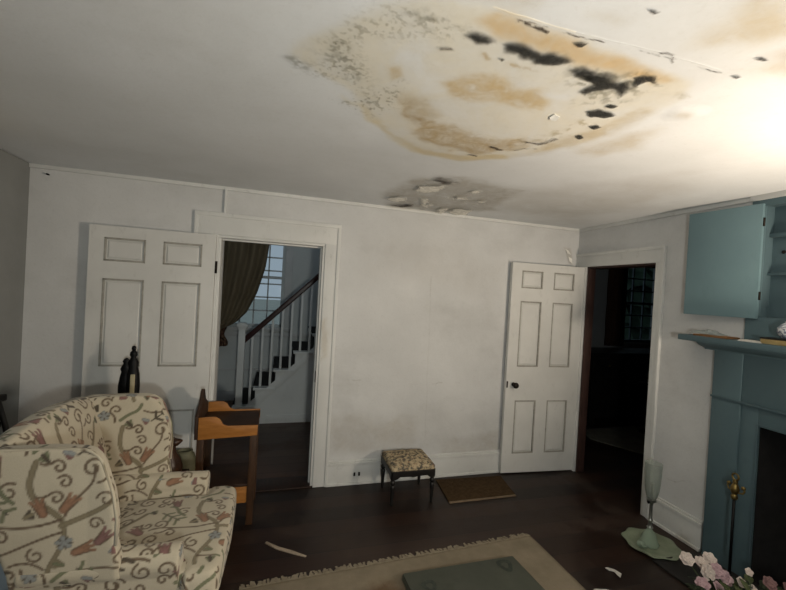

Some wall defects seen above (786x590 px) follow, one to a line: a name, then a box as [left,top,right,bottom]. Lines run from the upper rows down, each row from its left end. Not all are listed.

leakage [470,34,491,44]
leakage [501,44,656,96]
leakage [589,105,617,130]
peeling [416,180,482,215]